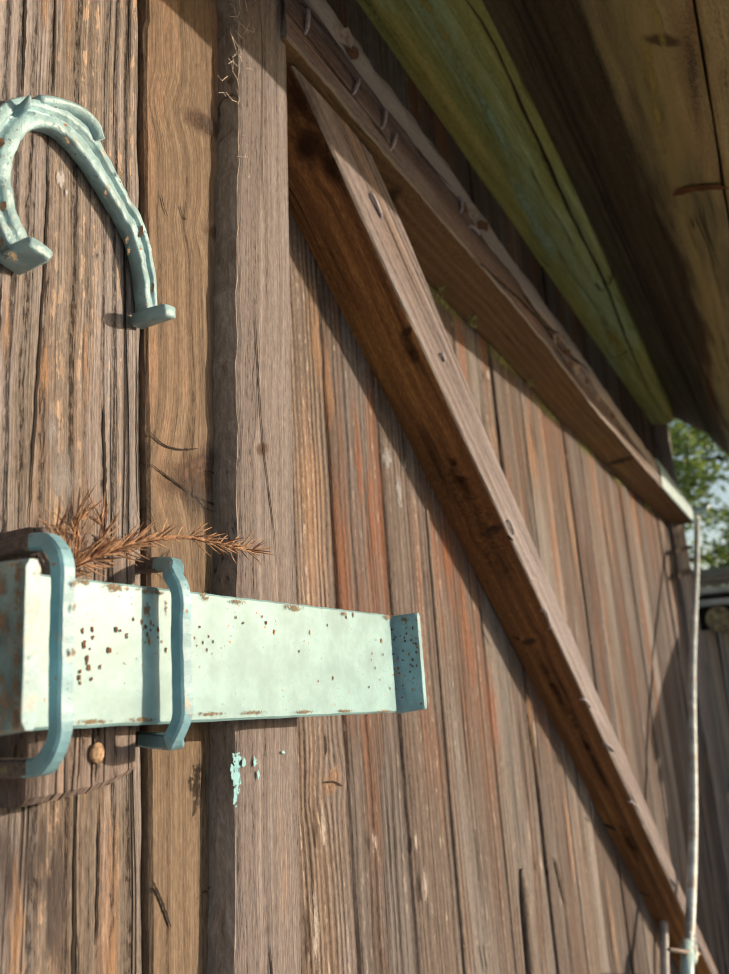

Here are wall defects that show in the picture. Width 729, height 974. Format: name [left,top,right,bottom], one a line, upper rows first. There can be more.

crack [126,0,134,85]
crack [466,0,648,387]
crack [101,401,109,529]
crack [137,354,215,519]
peeling [230,752,260,807]
crack [151,880,171,927]